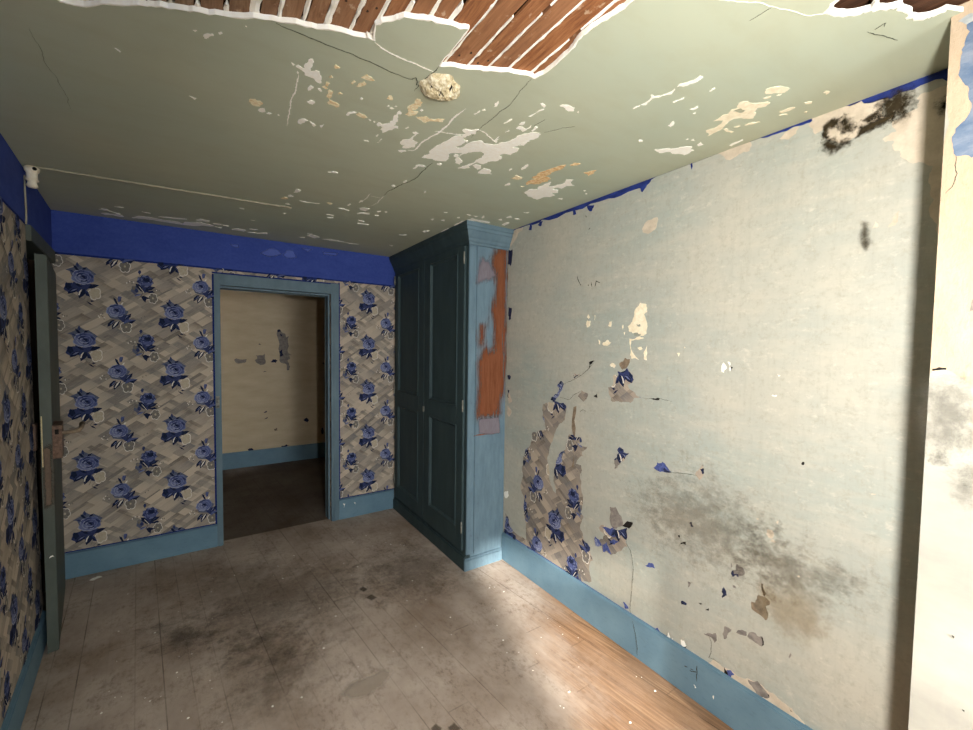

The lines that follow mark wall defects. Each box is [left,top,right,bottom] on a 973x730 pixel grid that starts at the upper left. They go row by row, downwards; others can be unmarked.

crack [287,74,299,124]
spalling [58,0,634,79]
crack [276,23,438,91]
peeling [292,59,444,153]
crack [363,84,527,205]
peeling [413,103,546,174]
peeling [633,76,703,109]
peeling [655,86,790,160]
water stain [822,89,917,154]
peeling [504,163,596,200]
spalling [779,0,973,385]
spalling [431,212,529,266]